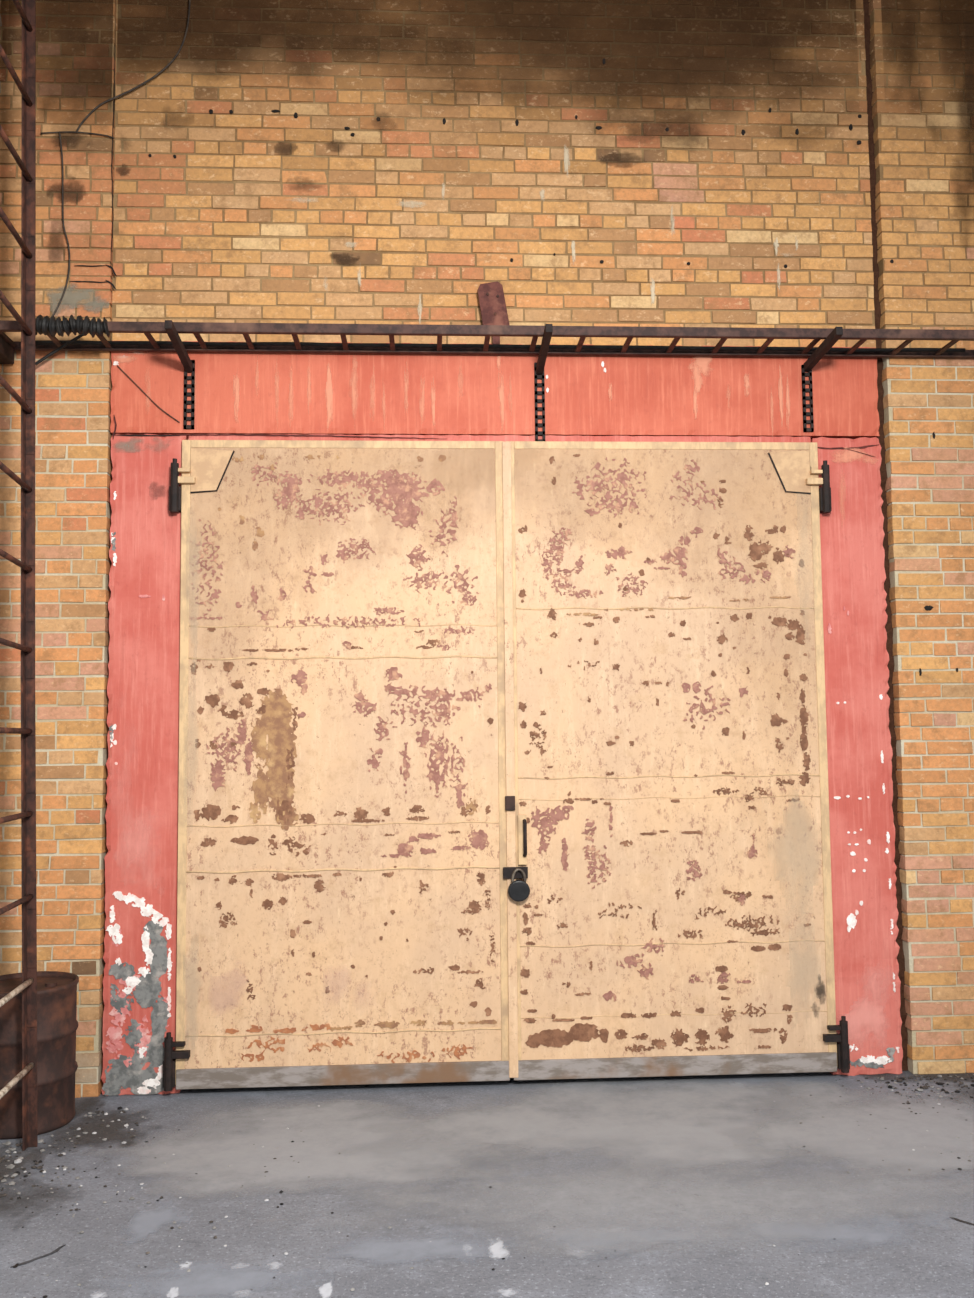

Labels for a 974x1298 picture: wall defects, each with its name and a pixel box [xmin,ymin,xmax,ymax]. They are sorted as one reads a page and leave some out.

leakage [36,0,412,102]
leakage [603,154,634,163]
leakage [444,0,820,102]
leakage [881,0,974,187]
peeling [232,454,479,606]
peeling [190,648,326,857]
peeling [334,667,494,877]
peeling [541,525,805,740]
peeling [713,610,811,810]
peeling [102,891,173,1096]
peeling [520,965,793,1052]
peeling [598,890,781,980]